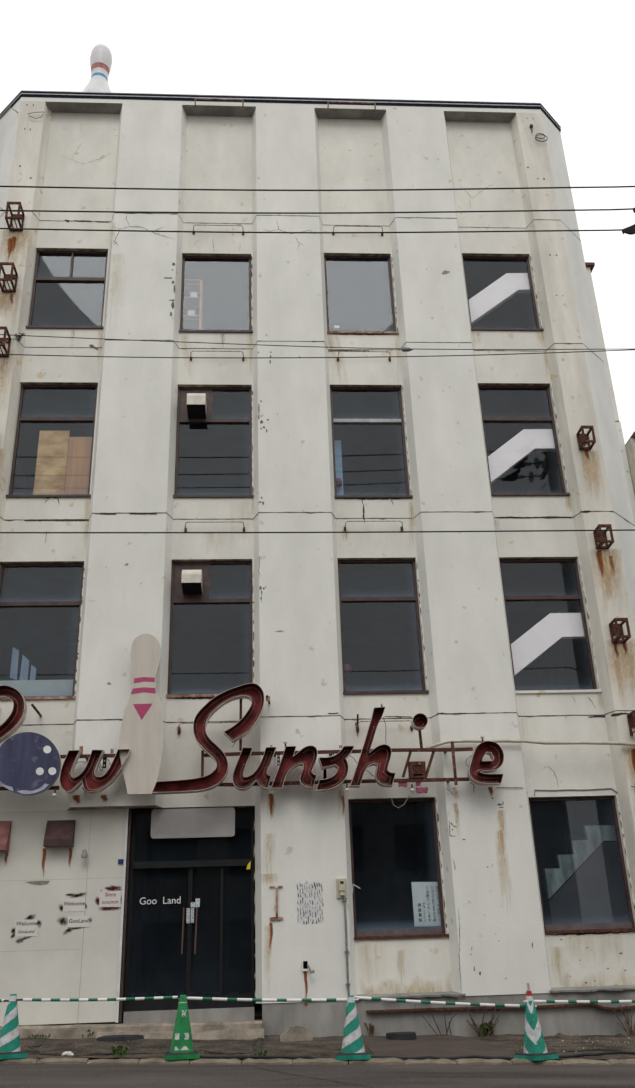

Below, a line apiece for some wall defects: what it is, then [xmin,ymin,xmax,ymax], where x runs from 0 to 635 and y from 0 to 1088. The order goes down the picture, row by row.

corrosion [596,549,618,593]